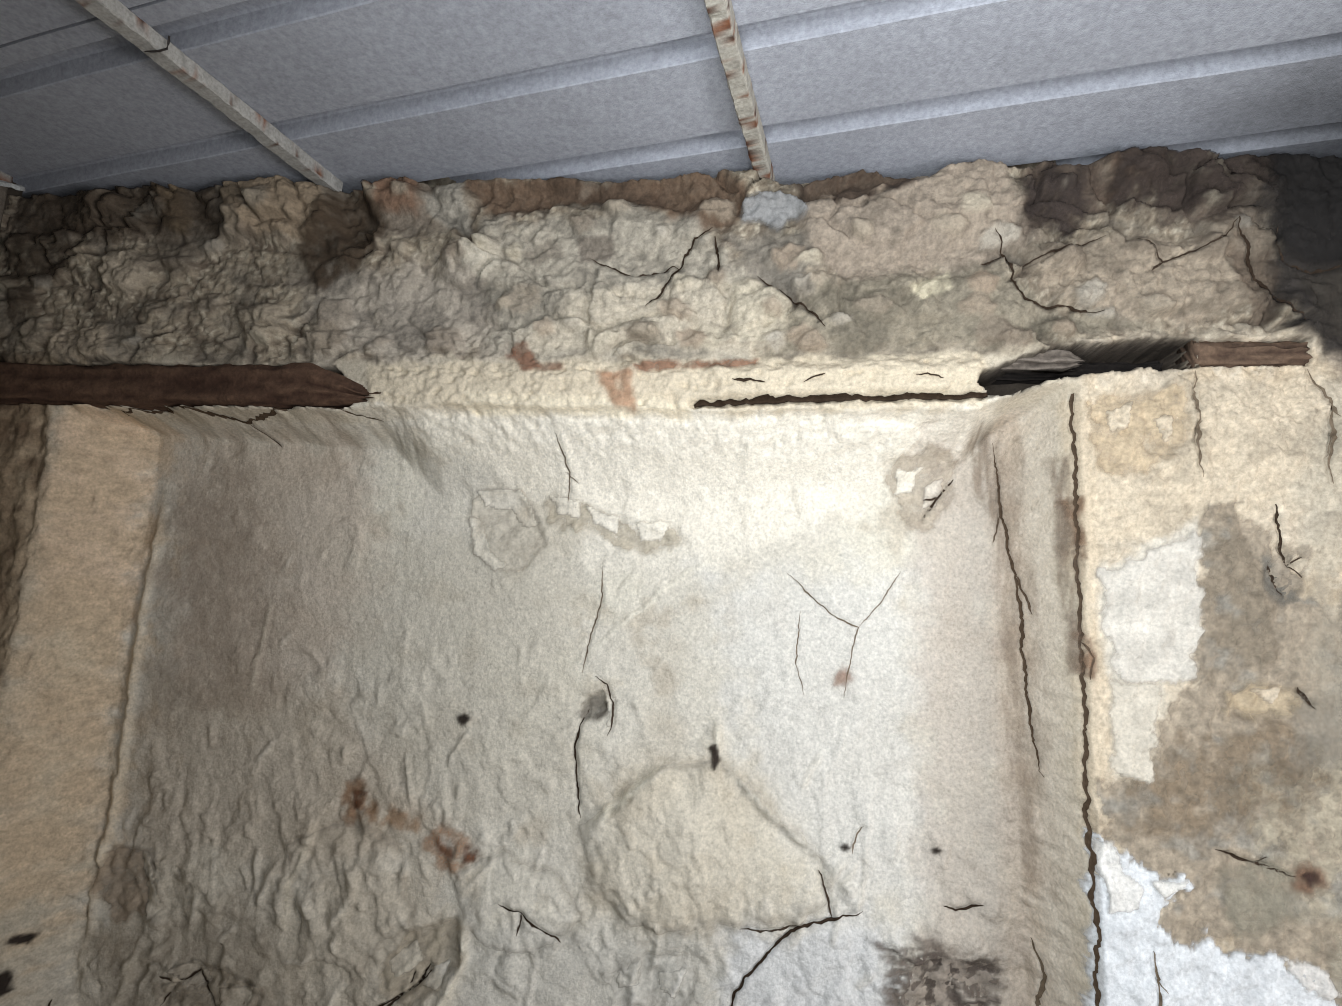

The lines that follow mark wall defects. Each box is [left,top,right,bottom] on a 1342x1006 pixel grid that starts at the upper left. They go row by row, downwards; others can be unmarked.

crack [694,372,988,408]
crack [992,443,1044,777]
leakage [1264,559,1296,604]
crack [574,571,614,818]
crack [1069,393,1102,1006]
peeling [1079,503,1342,1006]
rust [344,780,373,817]
rust [425,827,476,872]
leakage [1226,864,1287,933]
rust [1293,867,1324,892]
crack [731,871,863,1006]
leakage [876,940,1000,1006]